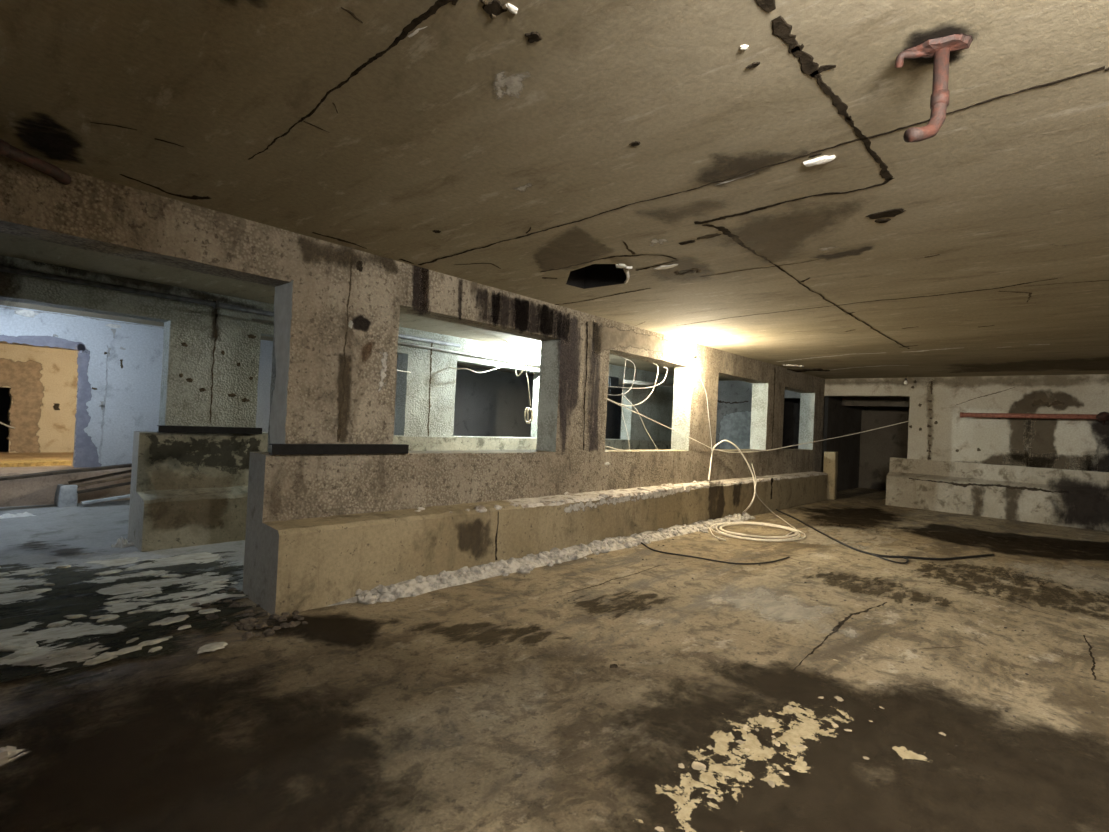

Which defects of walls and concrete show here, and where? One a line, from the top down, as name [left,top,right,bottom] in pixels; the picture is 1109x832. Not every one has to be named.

crack [248,0,458,160]
crack [399,178,740,269]
crack [636,0,1109,357]
crack [0,306,164,463]
crack [426,343,434,436]
crack [541,242,678,450]
leakage [777,353,1109,619]
crack [795,602,887,668]
crack [937,582,1096,680]